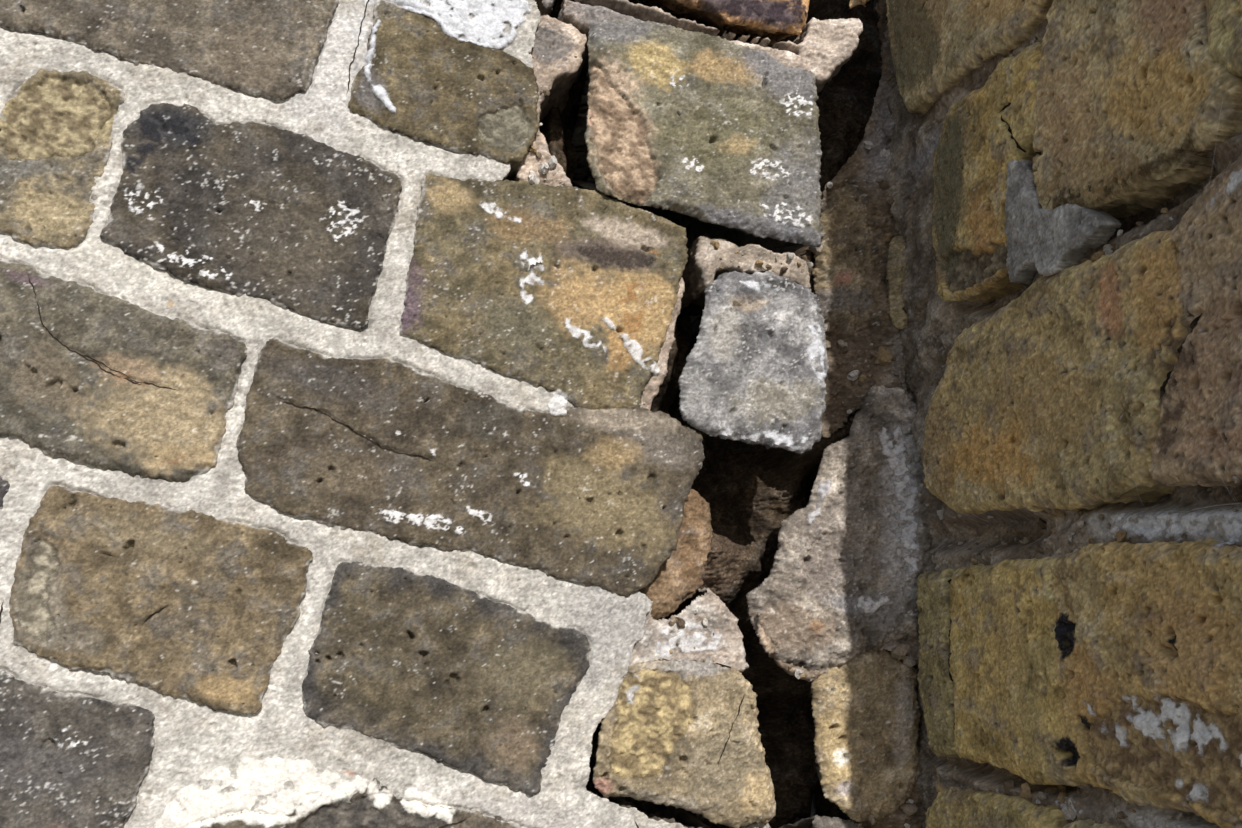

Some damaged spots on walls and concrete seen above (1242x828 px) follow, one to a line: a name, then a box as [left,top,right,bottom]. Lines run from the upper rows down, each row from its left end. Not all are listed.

crack [539,68,587,187]
crack [771,0,883,196]
crack [793,246,815,293]
crack [28,276,176,390]
crack [281,401,431,461]
crack [650,303,858,828]
leakage [1085,695,1242,767]
spalling [302,796,457,828]
crack [586,754,696,828]
leakage [1175,779,1208,800]